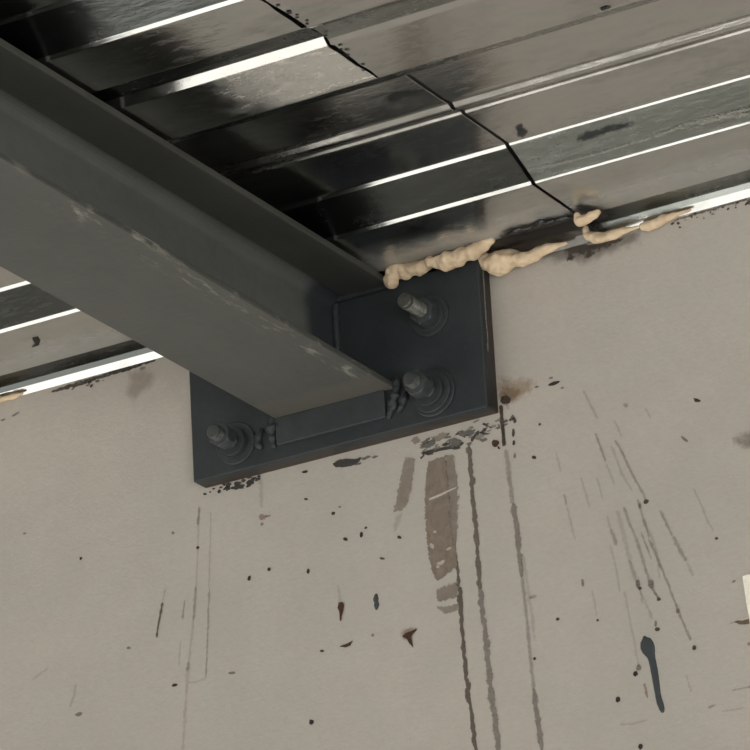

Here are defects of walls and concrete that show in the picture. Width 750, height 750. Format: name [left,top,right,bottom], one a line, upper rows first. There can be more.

peeling [411,415,515,459]
water stain [394,458,415,512]
water stain [511,503,524,577]
water stain [424,455,478,750]
water stain [466,447,501,750]
water stain [532,688,543,750]